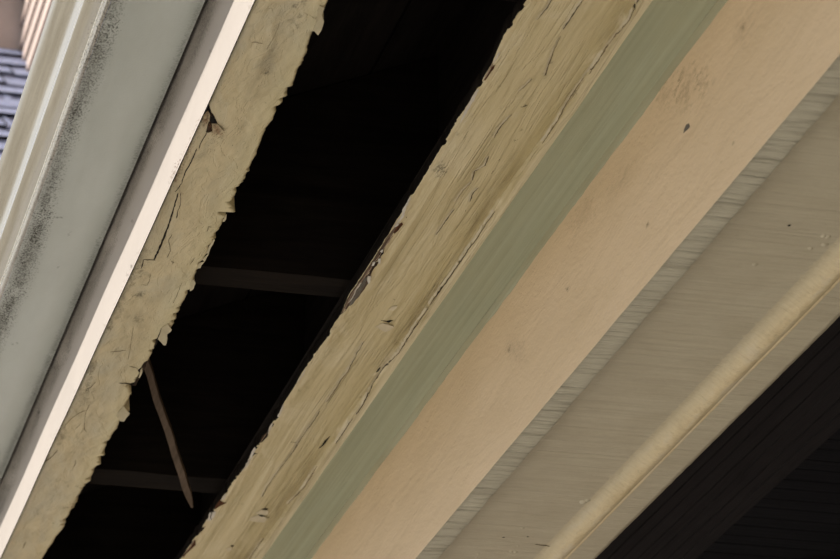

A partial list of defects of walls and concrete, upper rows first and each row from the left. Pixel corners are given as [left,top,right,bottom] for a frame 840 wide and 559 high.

peeling [313,5,325,35]
crack [493,0,583,137]
crack [540,0,639,144]
spalling [201,105,223,135]
leakage [0,0,121,329]
crack [141,133,207,285]
crack [434,156,500,235]
peeling [158,324,172,345]
crack [261,210,494,504]
peeling [116,407,130,421]
peeling [242,404,284,471]
peeling [183,494,226,557]